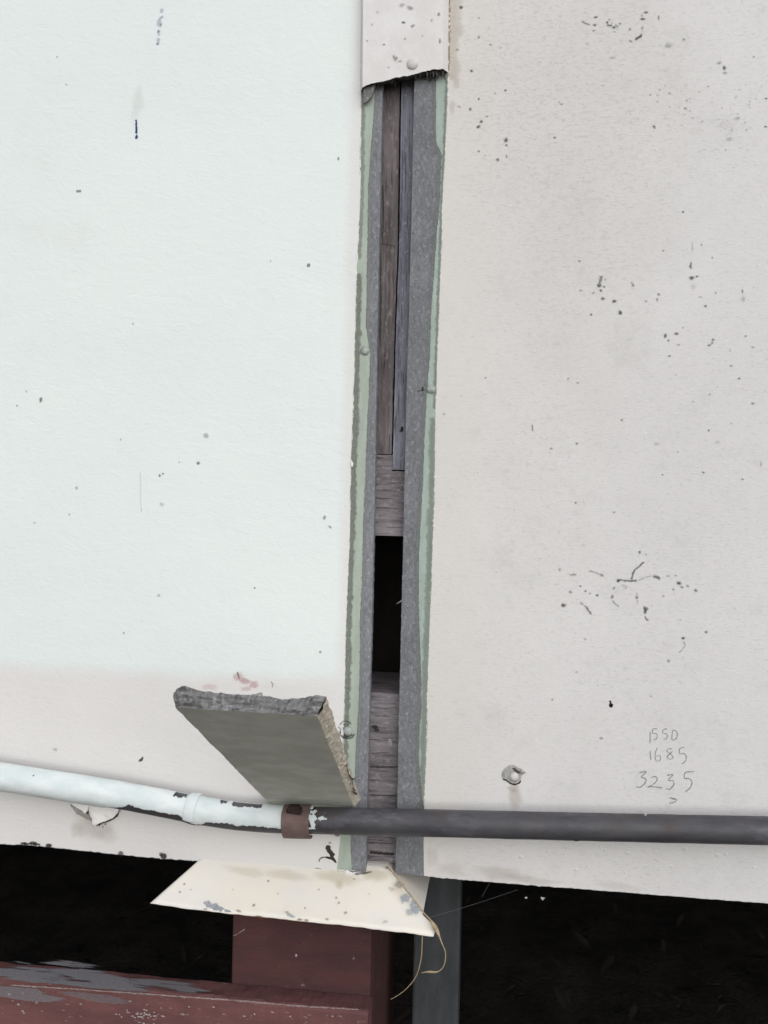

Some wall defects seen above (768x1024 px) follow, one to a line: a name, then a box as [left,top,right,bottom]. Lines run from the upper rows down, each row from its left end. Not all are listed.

peeling [69,802,121,828]